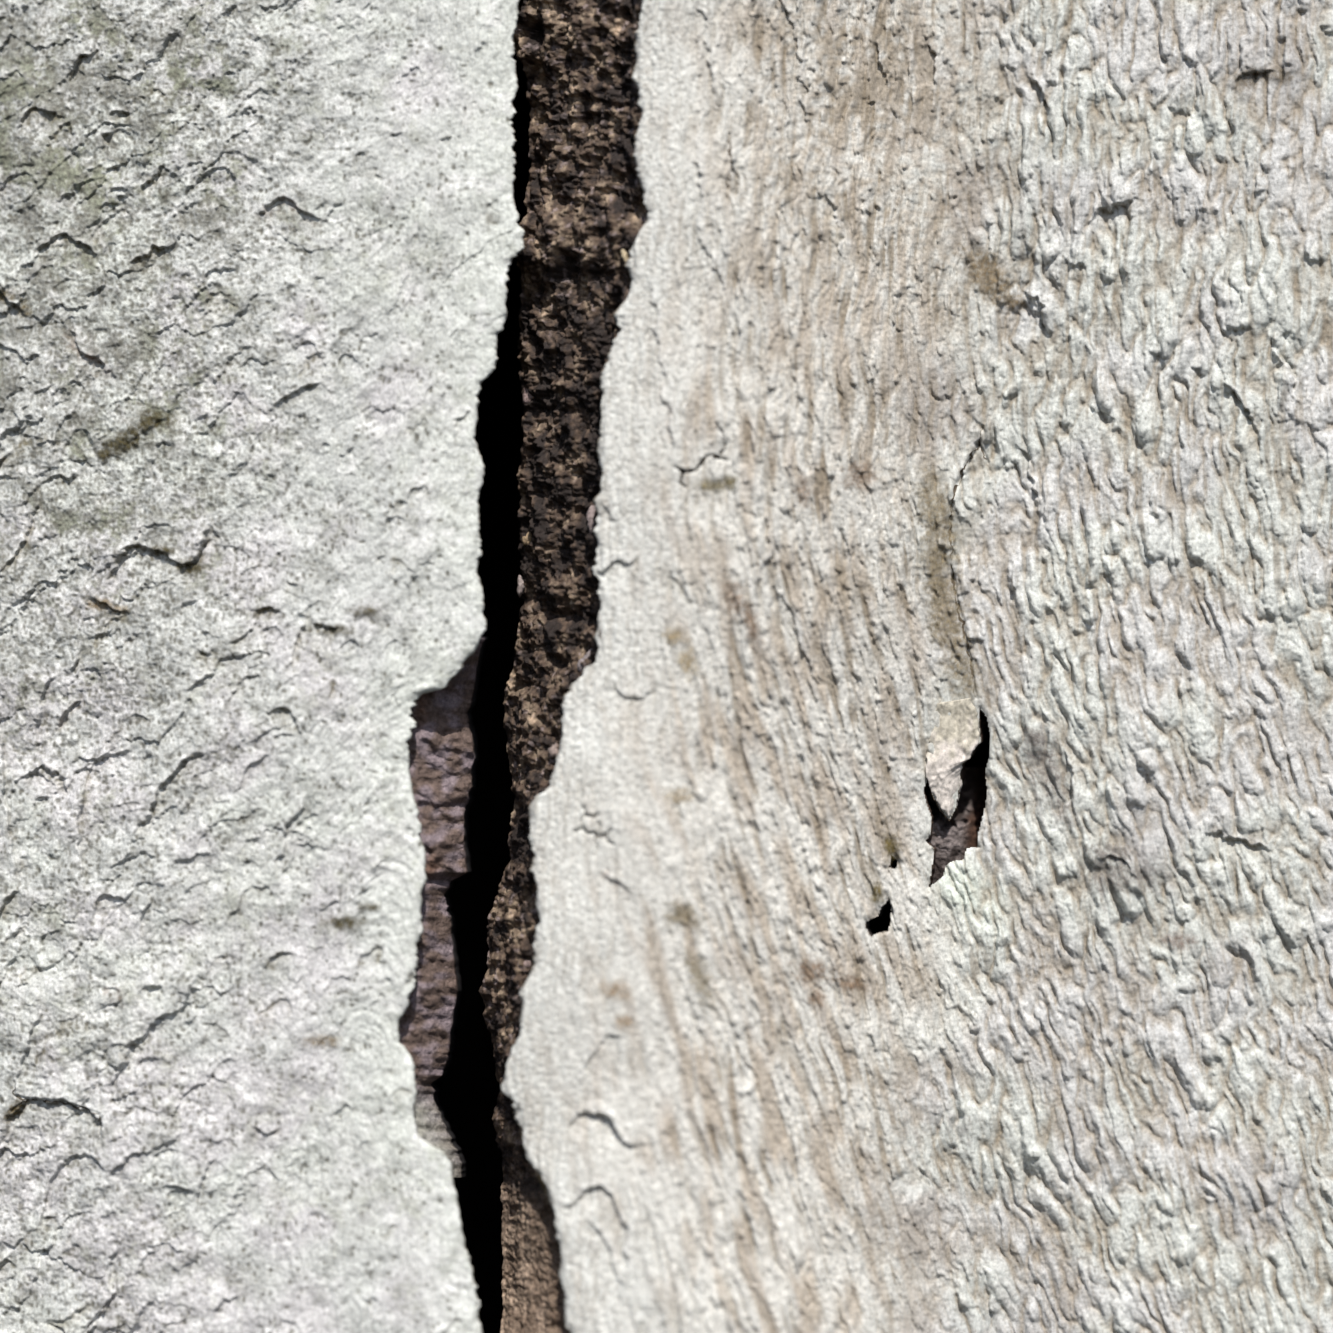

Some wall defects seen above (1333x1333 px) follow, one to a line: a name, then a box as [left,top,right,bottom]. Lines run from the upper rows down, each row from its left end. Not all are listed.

crack [399,0,648,1333]
peeling [925,698,980,817]